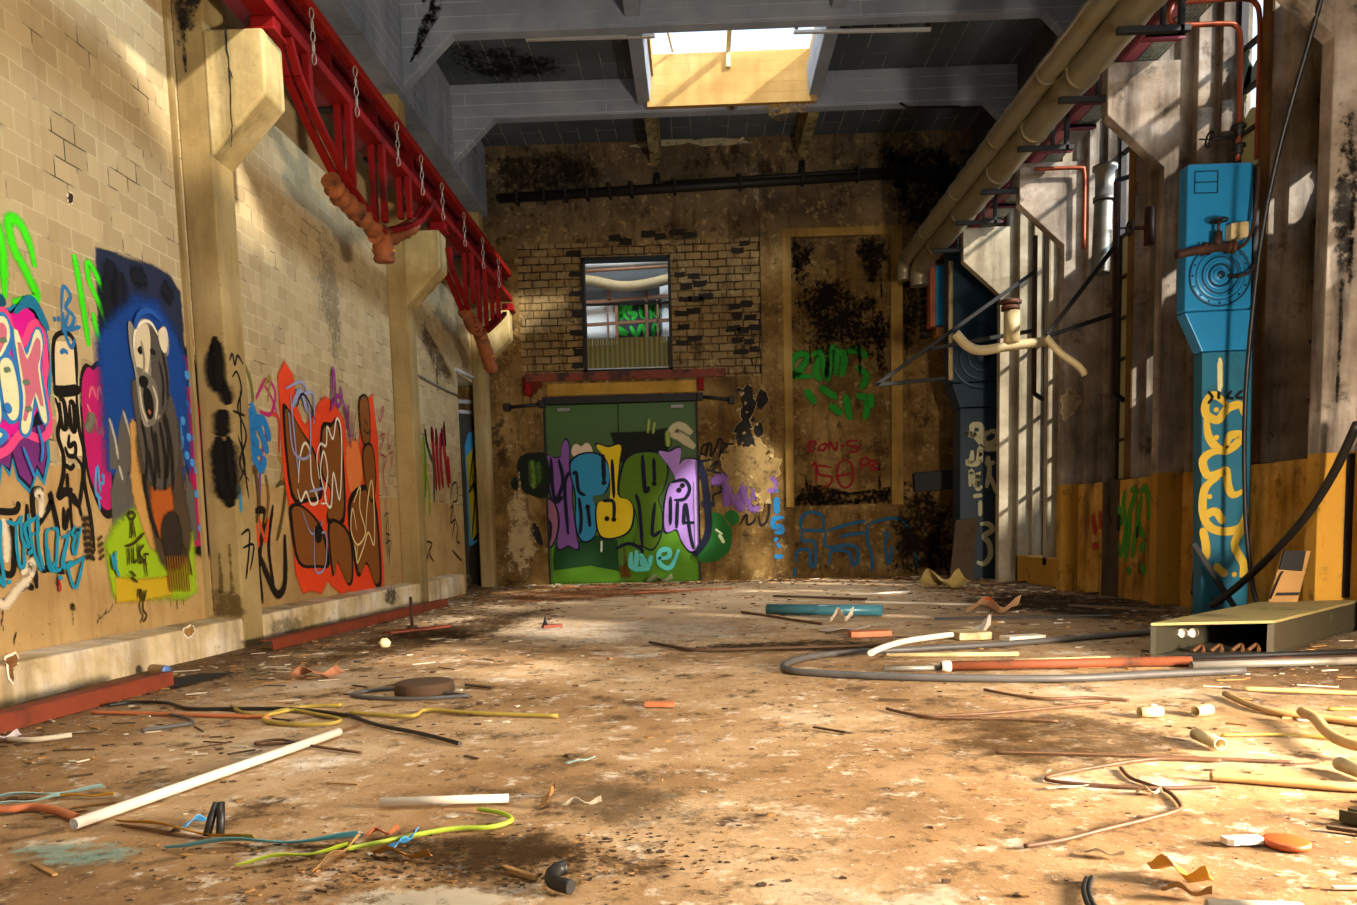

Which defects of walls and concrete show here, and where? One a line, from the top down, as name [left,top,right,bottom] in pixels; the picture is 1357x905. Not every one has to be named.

damp [410,0,442,62]
damp [791,235,924,378]